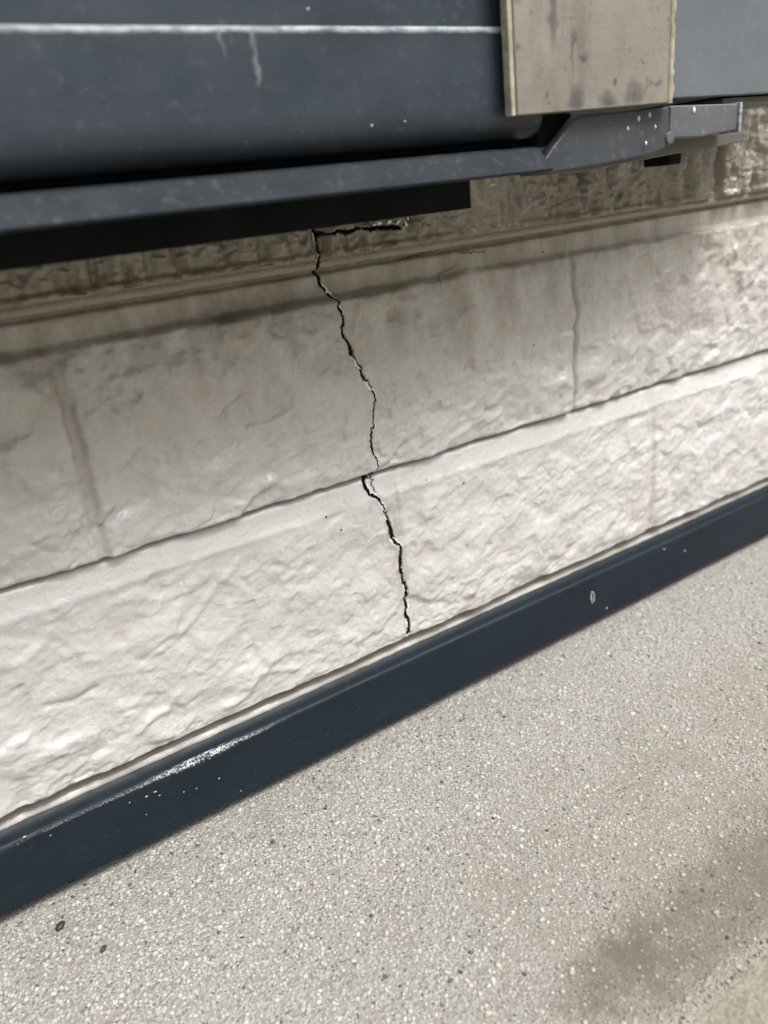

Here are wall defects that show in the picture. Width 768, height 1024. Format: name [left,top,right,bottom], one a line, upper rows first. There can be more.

crack [312,217,410,633]